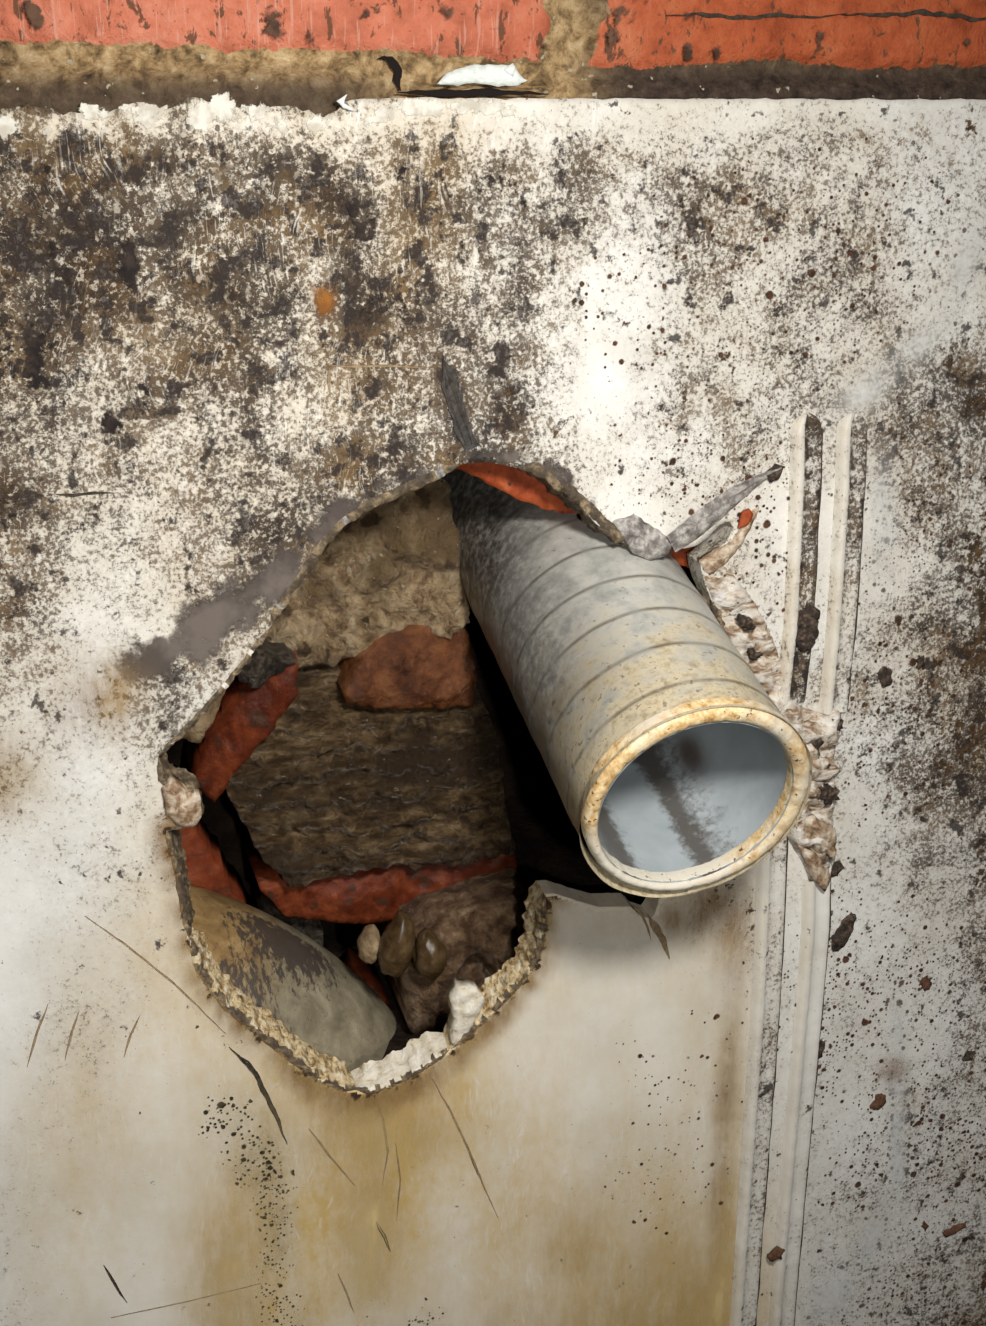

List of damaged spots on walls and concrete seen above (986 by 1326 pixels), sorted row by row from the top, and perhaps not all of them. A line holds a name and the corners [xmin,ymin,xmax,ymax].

crack [666,9,986,22]
peeling [0,114,20,139]
peeling [78,103,168,130]
peeling [186,63,527,137]
rust [314,287,335,316]
spalling [517,461,629,547]
spalling [157,358,560,1102]
spalling [697,557,844,892]
water stain [700,879,755,964]
crack [229,1047,287,1144]
water stain [198,1096,305,1326]
water stain [347,1180,389,1300]